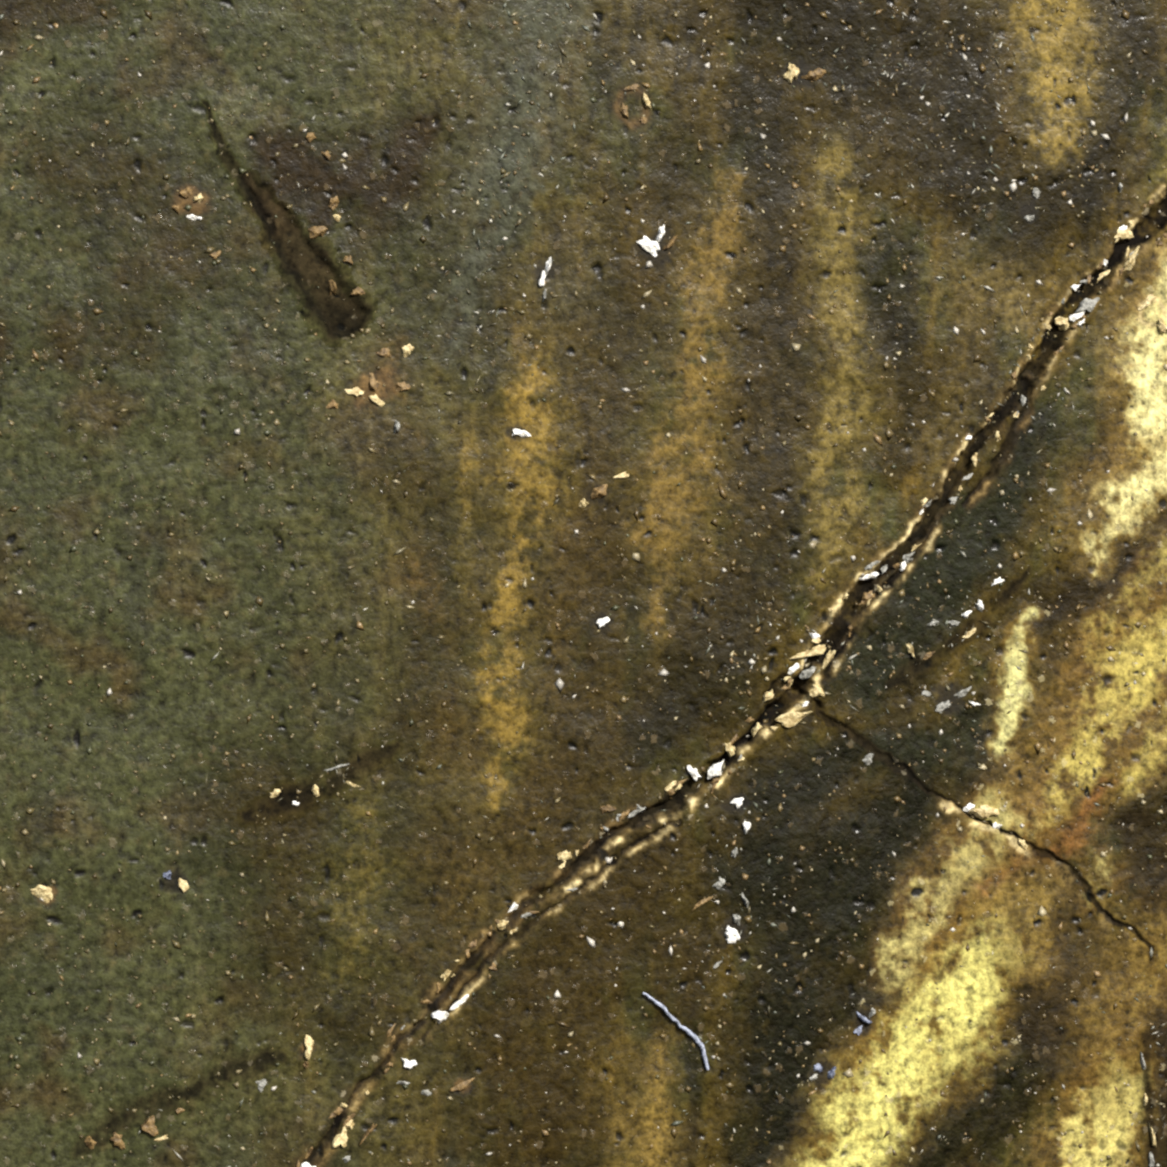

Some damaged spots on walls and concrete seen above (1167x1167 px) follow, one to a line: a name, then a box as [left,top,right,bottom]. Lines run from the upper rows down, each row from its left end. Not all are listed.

leakage [977,0,1167,273]
leakage [171,219,1167,1167]
crack [287,174,1167,1167]